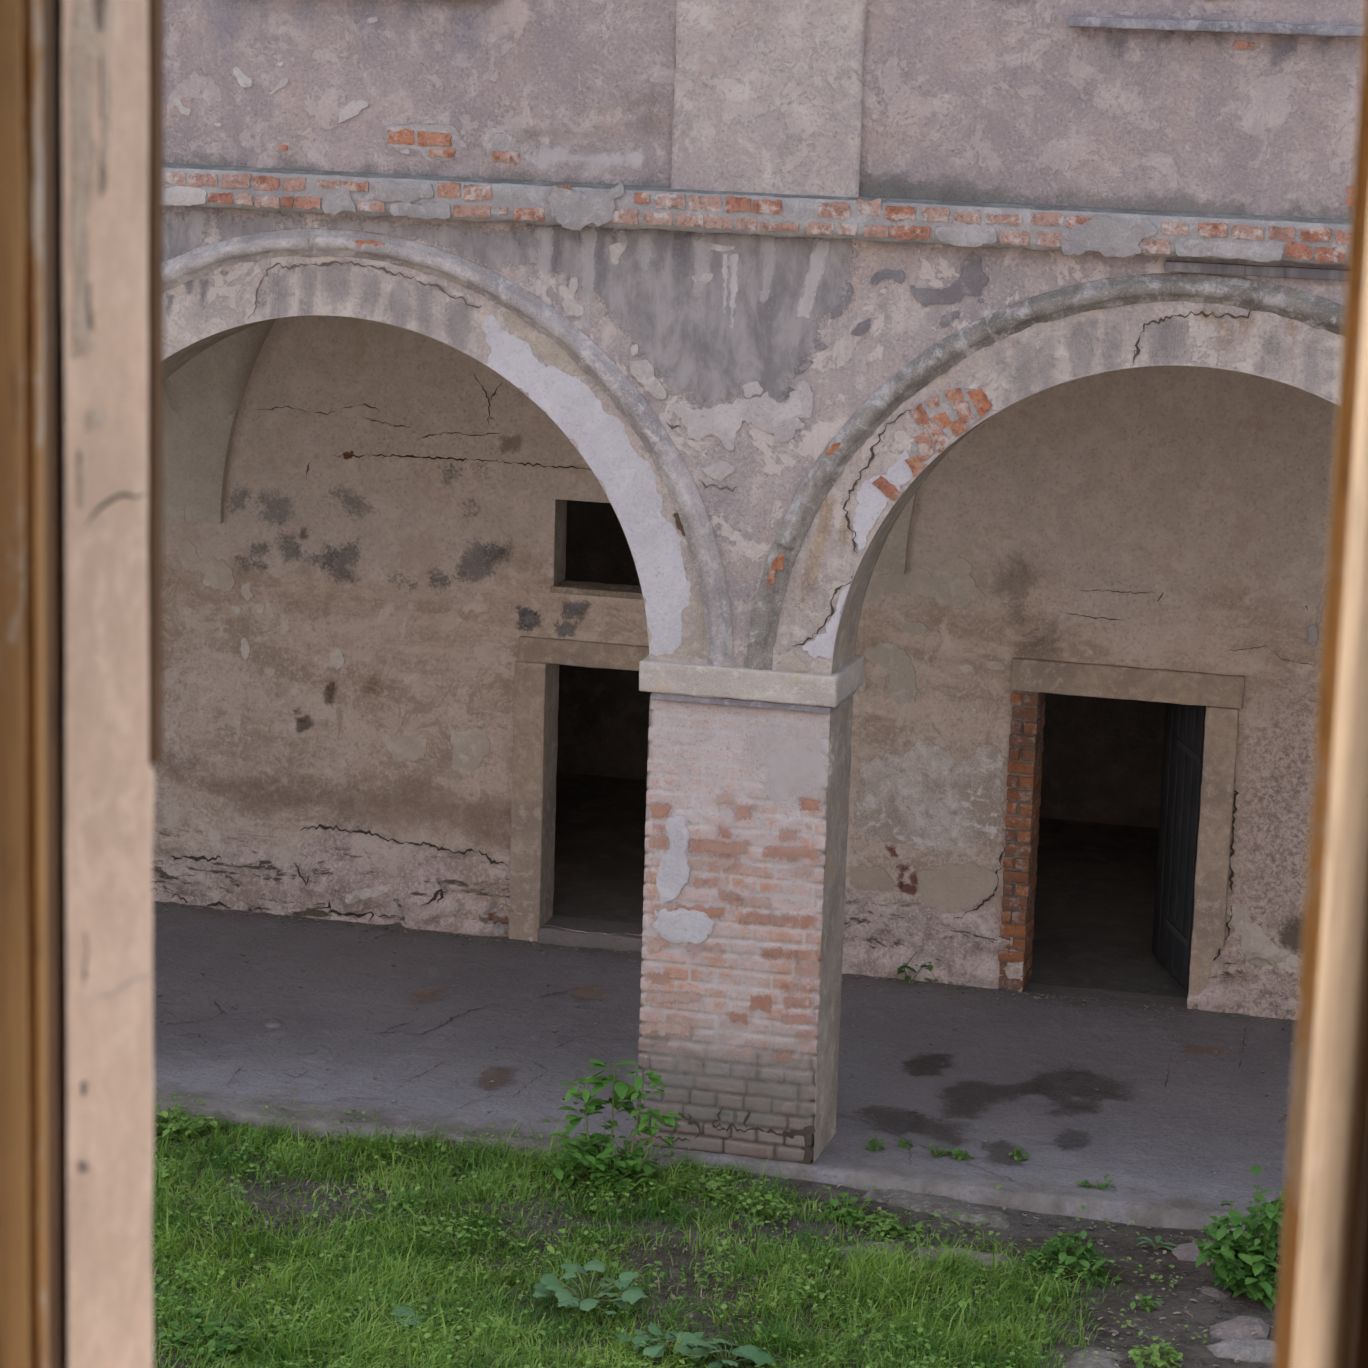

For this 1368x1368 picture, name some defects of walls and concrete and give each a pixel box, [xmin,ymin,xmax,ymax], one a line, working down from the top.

flaking render [164,115,1353,328]
crack [1130,310,1256,367]
crack [254,374,591,477]
peeling [481,311,691,656]
flaking render [630,339,828,481]
flaking render [853,382,996,550]
leakage [235,535,359,582]
leakage [430,541,511,587]
crack [171,855,263,913]
crack [300,824,507,865]
leakage [858,1054,1126,1145]
leakage [983,1141,1021,1165]